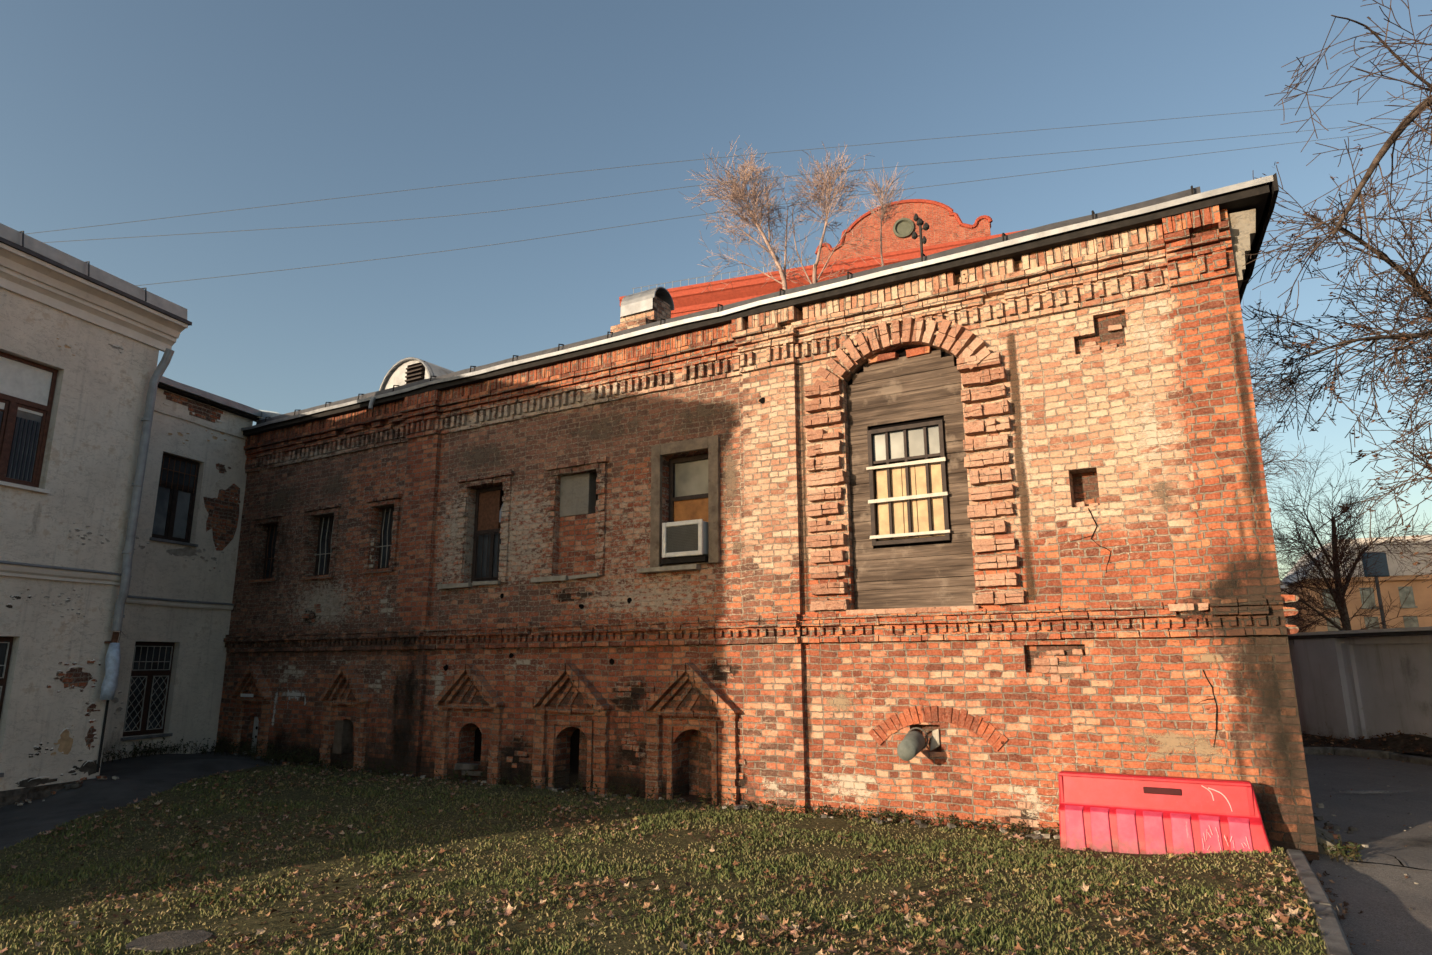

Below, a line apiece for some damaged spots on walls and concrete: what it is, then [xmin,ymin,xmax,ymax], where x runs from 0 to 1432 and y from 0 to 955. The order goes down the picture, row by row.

spalling [163,391,240,573]
spalling [15,659,123,788]